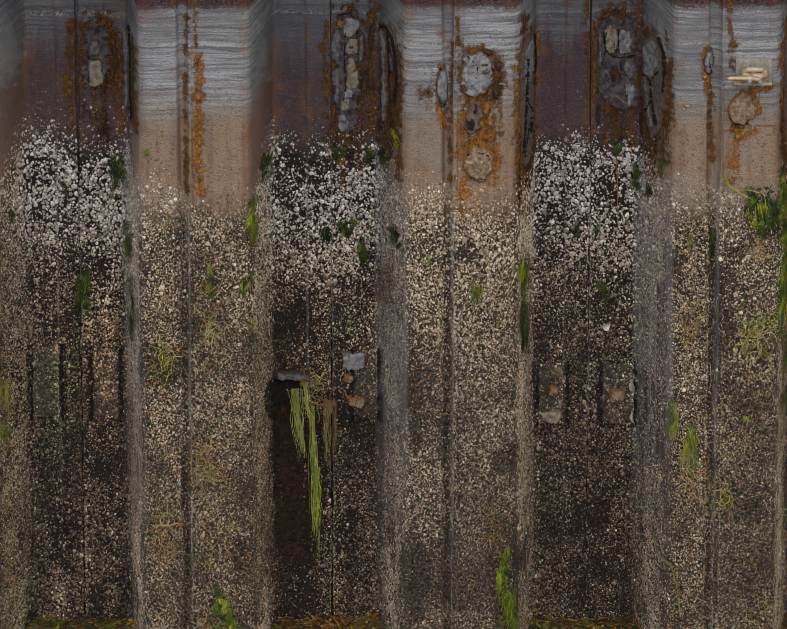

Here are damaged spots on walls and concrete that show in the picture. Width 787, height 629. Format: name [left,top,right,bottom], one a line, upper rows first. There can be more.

corrosion [182,12,207,197]
spalling [326,0,406,187]
corrosion [582,0,599,136]
spalling [777,16,787,187]